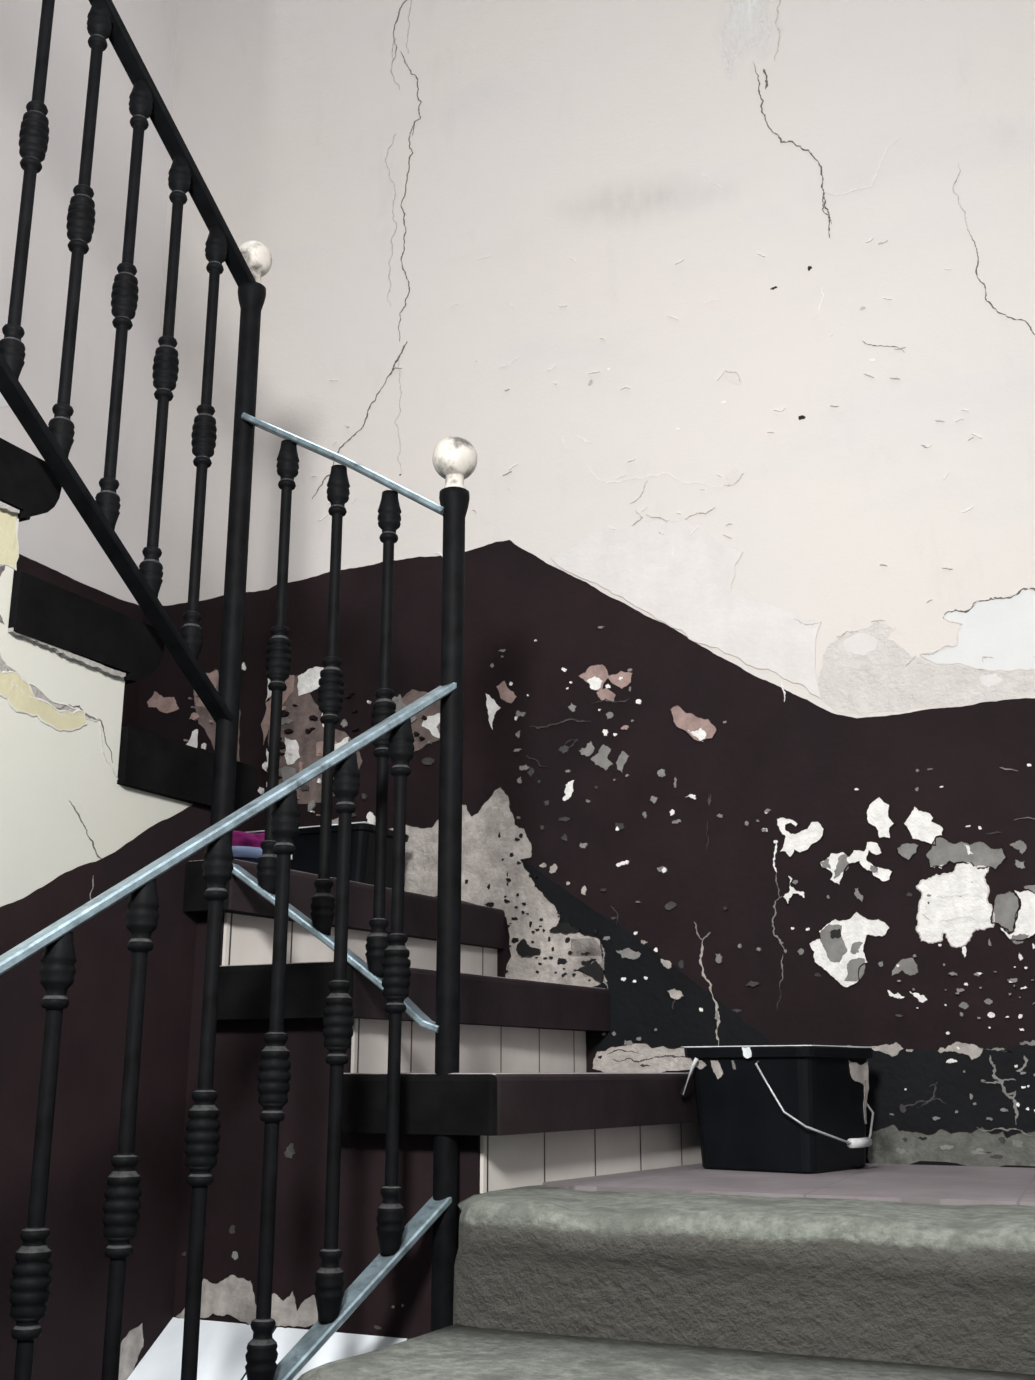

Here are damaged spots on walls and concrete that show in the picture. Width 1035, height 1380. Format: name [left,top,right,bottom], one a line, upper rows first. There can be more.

crack [754,0,900,238]
crack [312,0,422,499]
crack [952,165,1035,335]
peeling [0,509,19,576]
peeling [0,653,99,732]
peeling [147,690,216,750]
peeling [258,667,440,897]
spalling [461,665,684,988]
peeling [669,705,726,743]
peeling [550,459,1035,716]
spalling [592,1028,691,1073]
peeling [745,768,1035,1167]